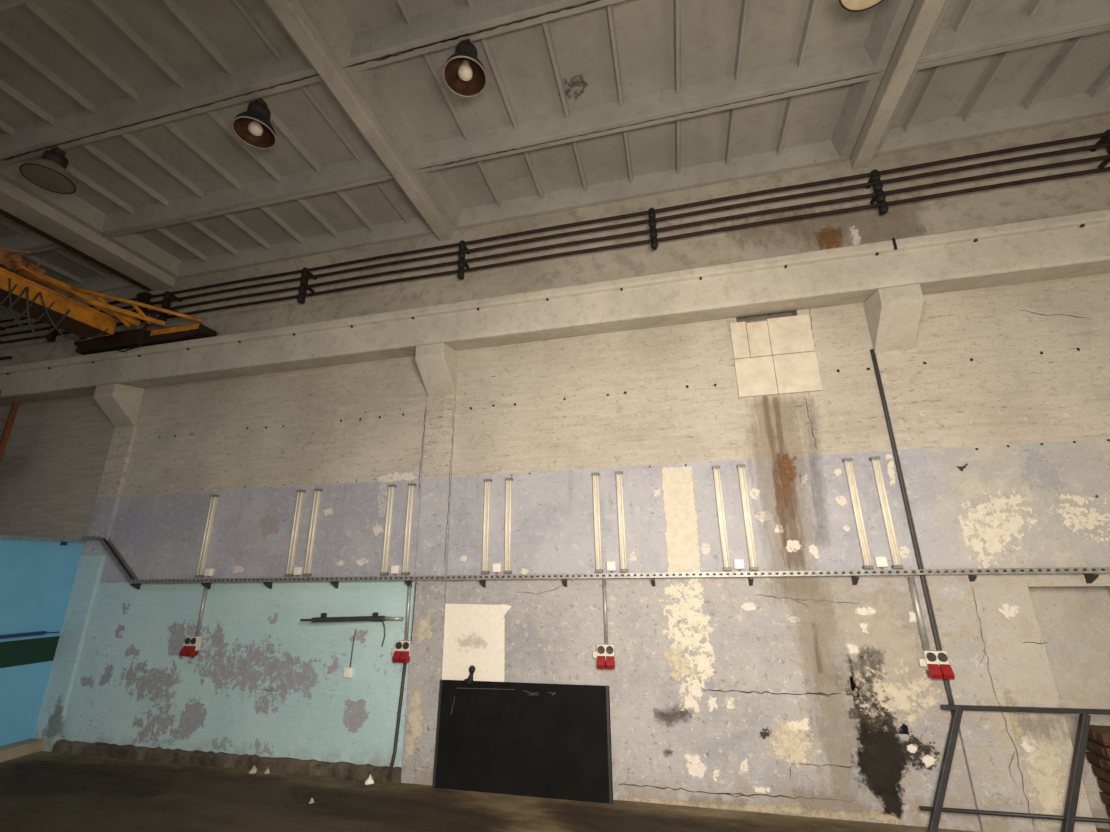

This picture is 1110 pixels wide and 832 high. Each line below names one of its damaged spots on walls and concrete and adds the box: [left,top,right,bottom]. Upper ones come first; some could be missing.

peeling [956,443,1110,576]
peeling [81,602,338,747]
peeling [342,699,369,733]
peeling [657,577,735,713]
peeling [683,753,720,781]
crack [971,586,1034,826]
peeling [998,603,1019,620]